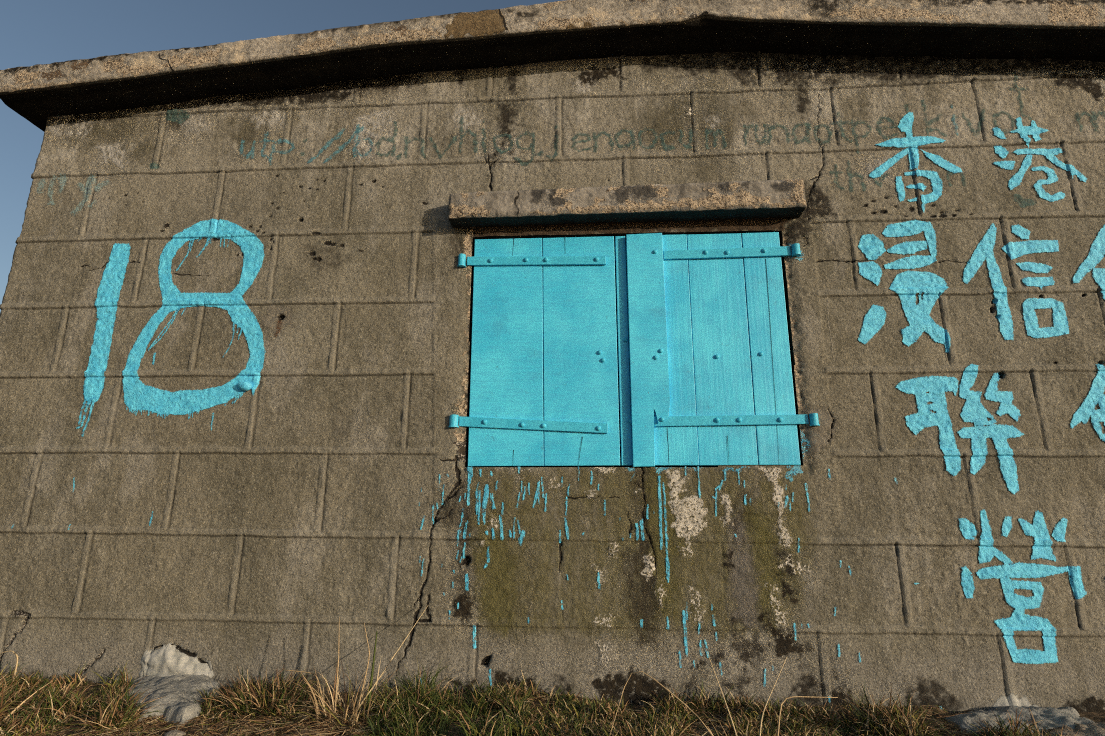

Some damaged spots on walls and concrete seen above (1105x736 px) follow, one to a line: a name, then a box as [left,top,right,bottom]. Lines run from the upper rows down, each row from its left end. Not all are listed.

leakage [579,66,627,85]
leakage [643,52,1105,113]
crack [800,94,869,263]
crack [396,455,463,676]
leakage [445,483,512,632]
leakage [623,475,676,620]
leakage [724,466,811,694]
crack [0,610,31,662]
leakage [492,671,571,697]
leakage [592,667,673,706]
leakage [791,675,857,706]
leakage [1064,696,1105,713]